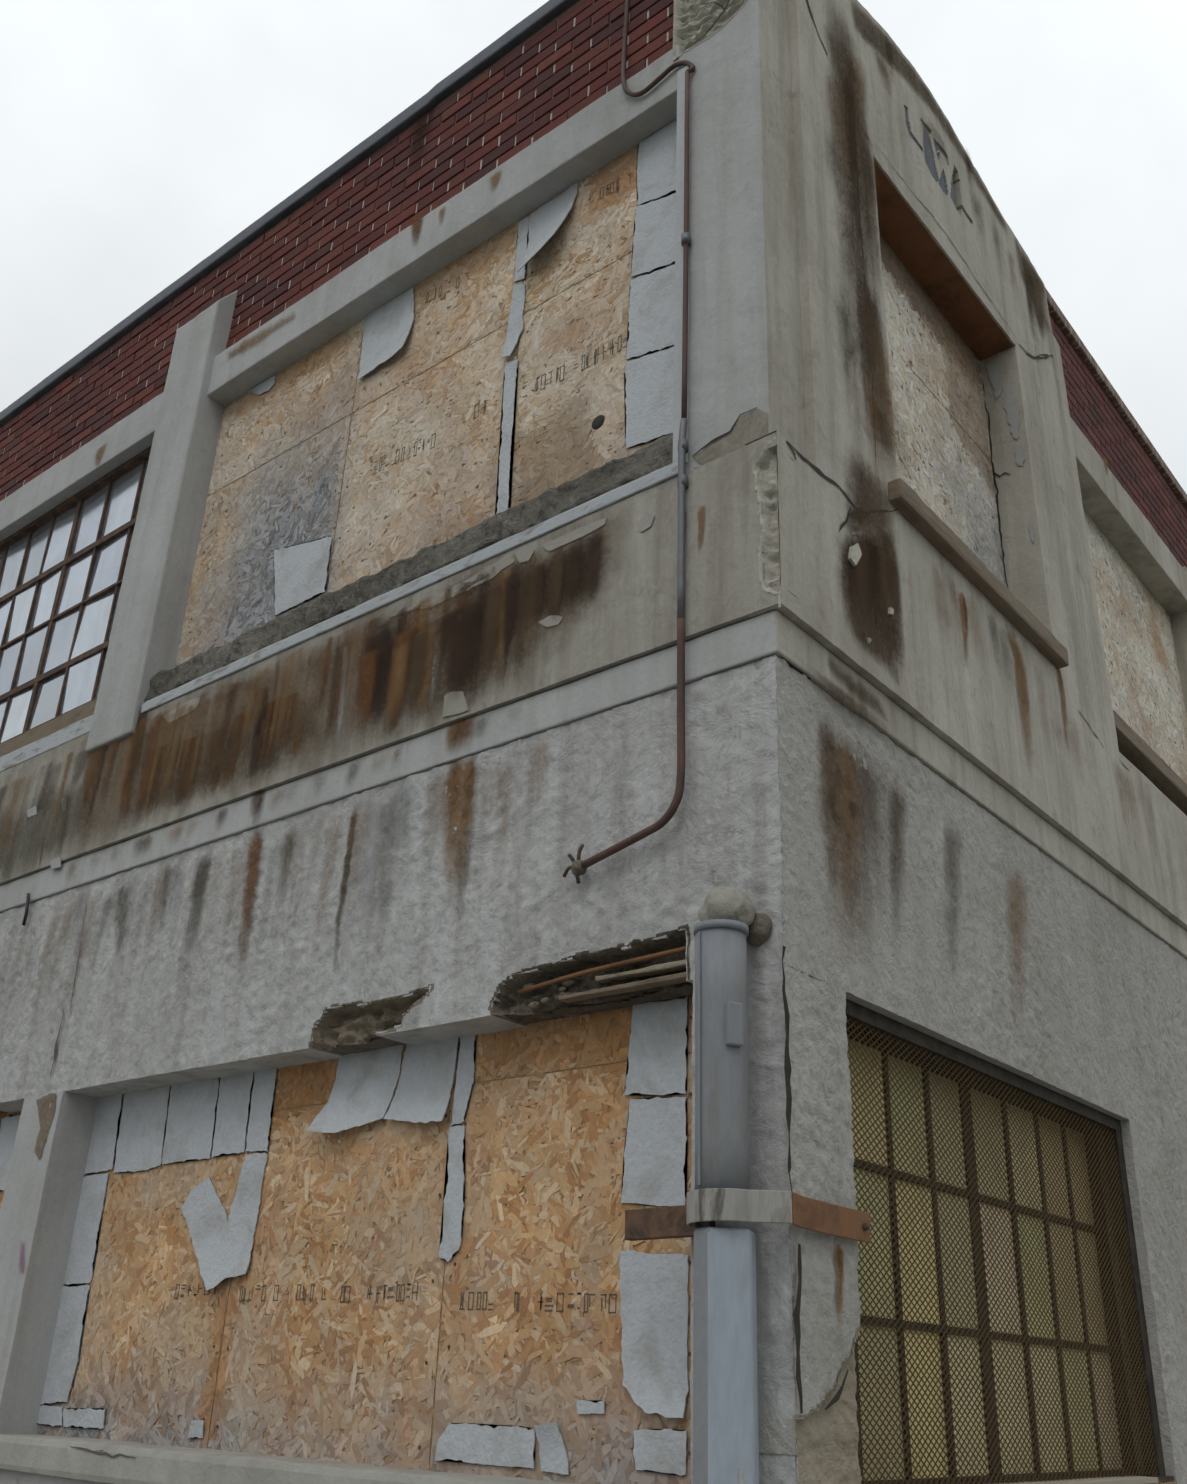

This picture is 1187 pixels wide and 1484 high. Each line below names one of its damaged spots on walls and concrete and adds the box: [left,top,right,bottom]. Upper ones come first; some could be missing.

spalling [673,0,747,60]
water stain [832,9,1004,436]
crack [693,407,757,469]
crack [787,441,898,532]
water stain [842,466,901,667]
rust [446,762,473,866]
water stain [824,728,904,867]
rust [243,834,261,929]
rust [336,815,355,932]
spalling [308,983,434,1051]
spalling [488,924,693,1016]
spalling [793,1324,862,1484]